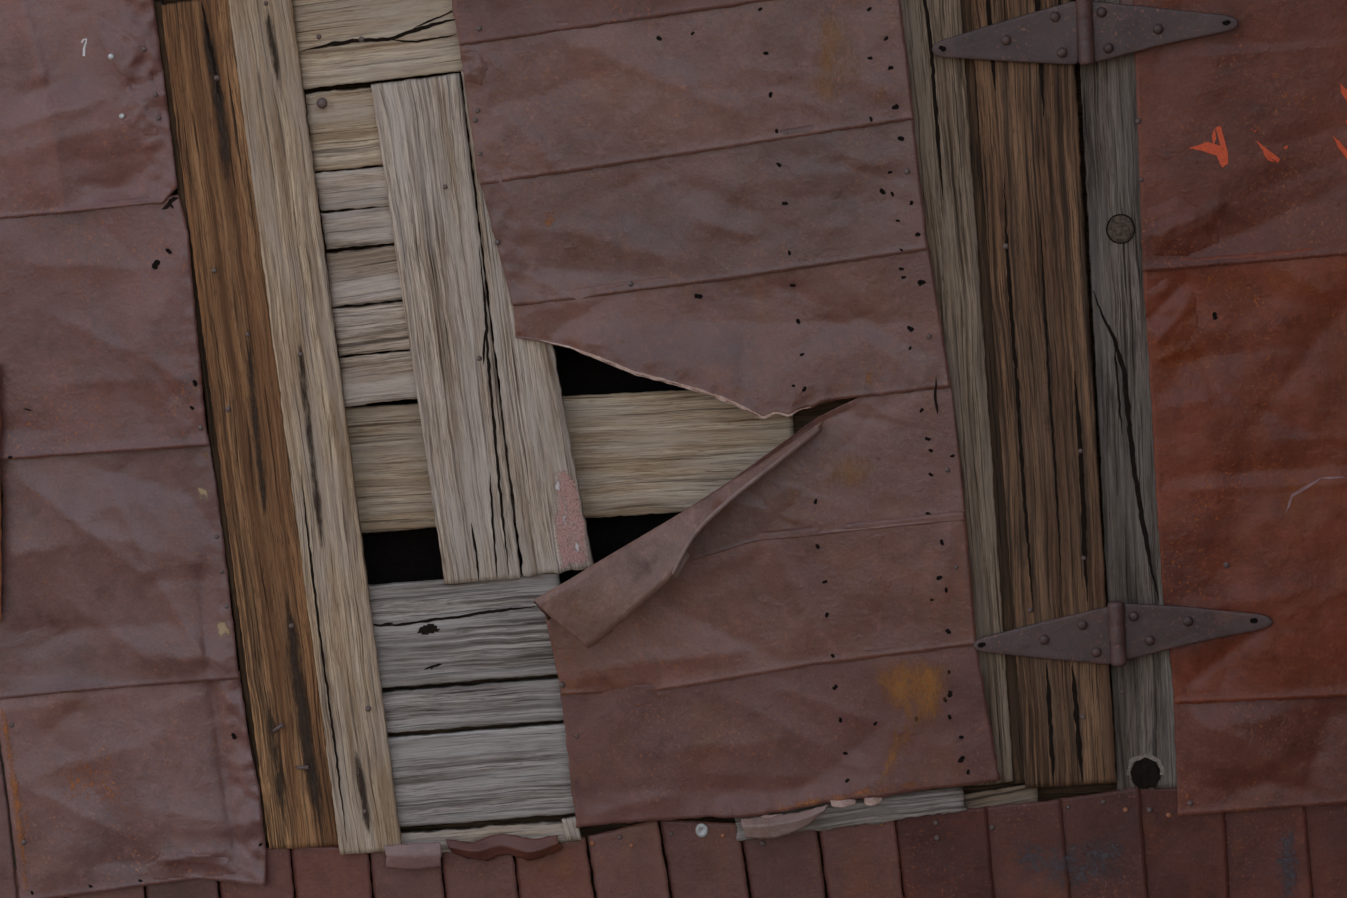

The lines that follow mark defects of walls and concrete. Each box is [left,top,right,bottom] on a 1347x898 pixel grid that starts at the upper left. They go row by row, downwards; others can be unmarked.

crack [300,11,456,52]
peeling [534,422,823,648]
crack [1003,178,1088,613]
crack [1093,291,1159,600]